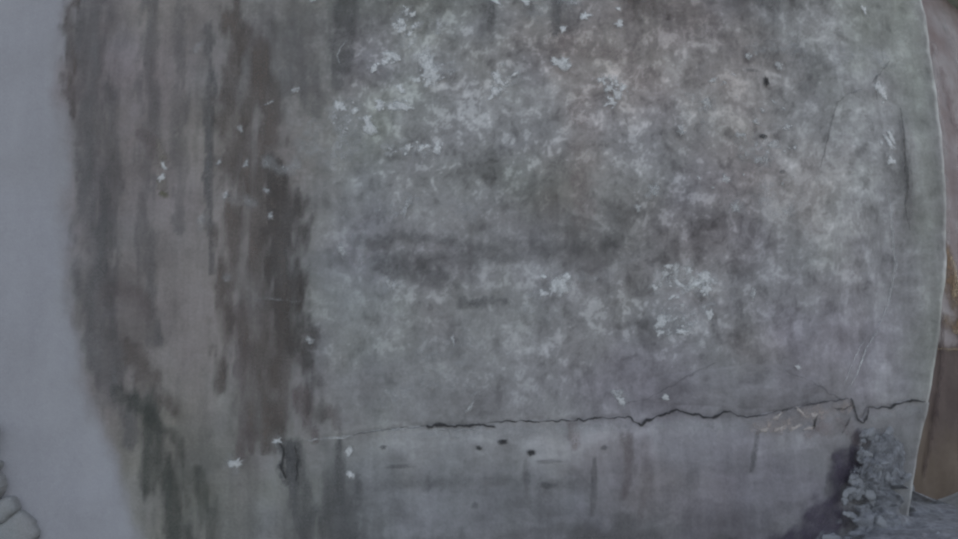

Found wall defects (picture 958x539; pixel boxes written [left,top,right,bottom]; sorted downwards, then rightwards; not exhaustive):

leakage [202,72,216,232]
leakage [121,394,191,539]
crack [377,399,925,431]